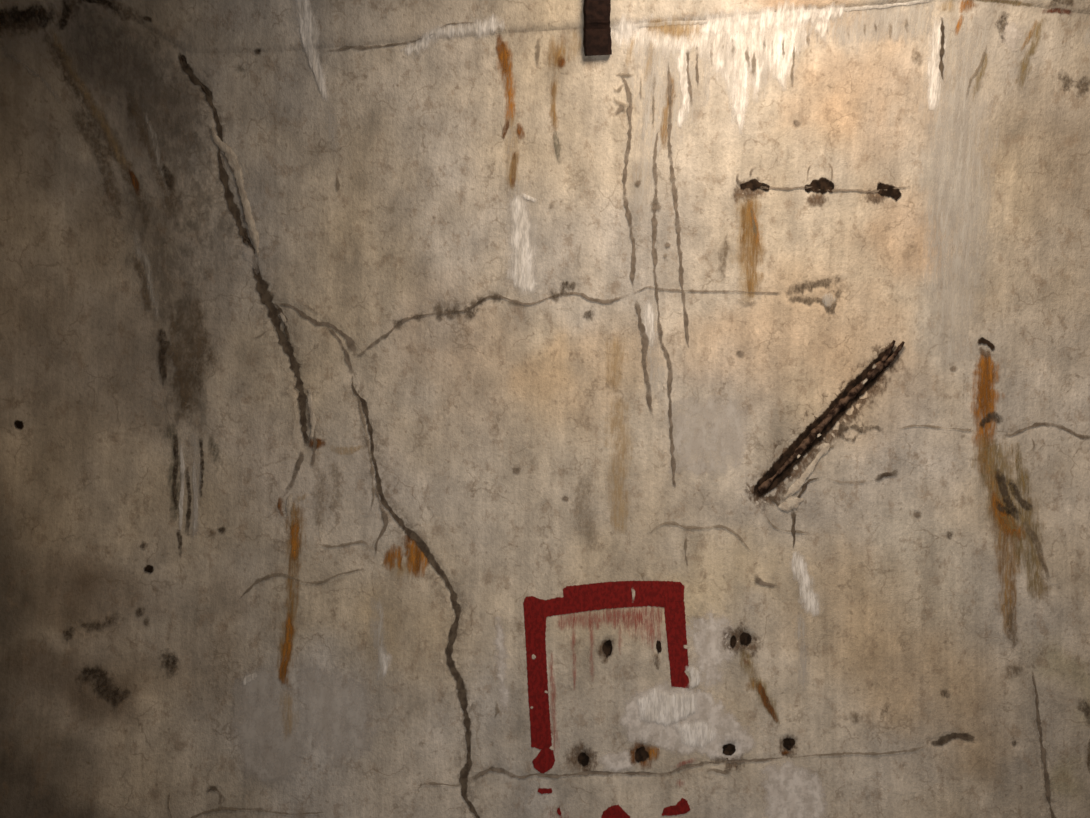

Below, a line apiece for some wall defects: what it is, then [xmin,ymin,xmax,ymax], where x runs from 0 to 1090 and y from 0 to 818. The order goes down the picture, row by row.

rust [496,36,524,138]
damp [1063,77,1090,93]
damp [611,0,1022,357]
rust [741,202,759,293]
crack [168,55,839,818]
crack [1008,422,1090,448]
flaking render [779,496,803,511]
crack [768,471,896,546]
rust [974,337,1048,644]
rust [278,494,302,682]
crack [805,733,974,757]
crack [1032,676,1056,818]